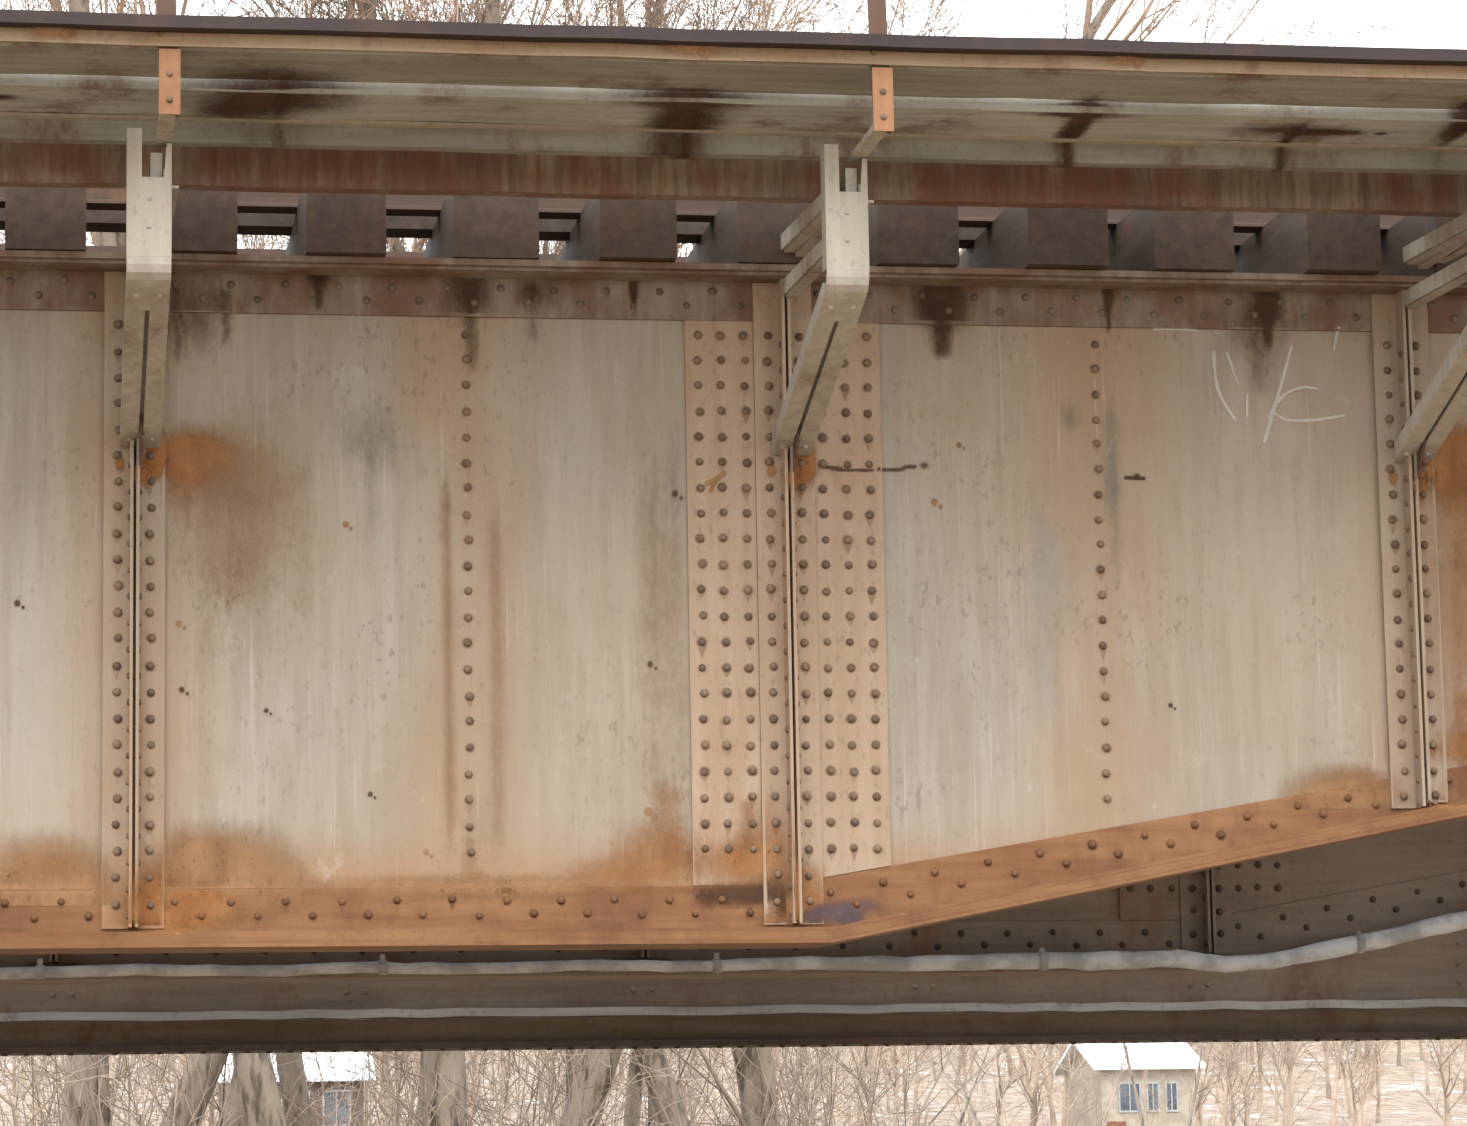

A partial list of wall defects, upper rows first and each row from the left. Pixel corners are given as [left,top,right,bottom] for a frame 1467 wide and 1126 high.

rust [116,431,240,494]
rust [768,447,927,495]
rust [1415,428,1467,506]
rust [1446,733,1467,764]
rust [132,833,301,935]
rust [708,833,825,927]